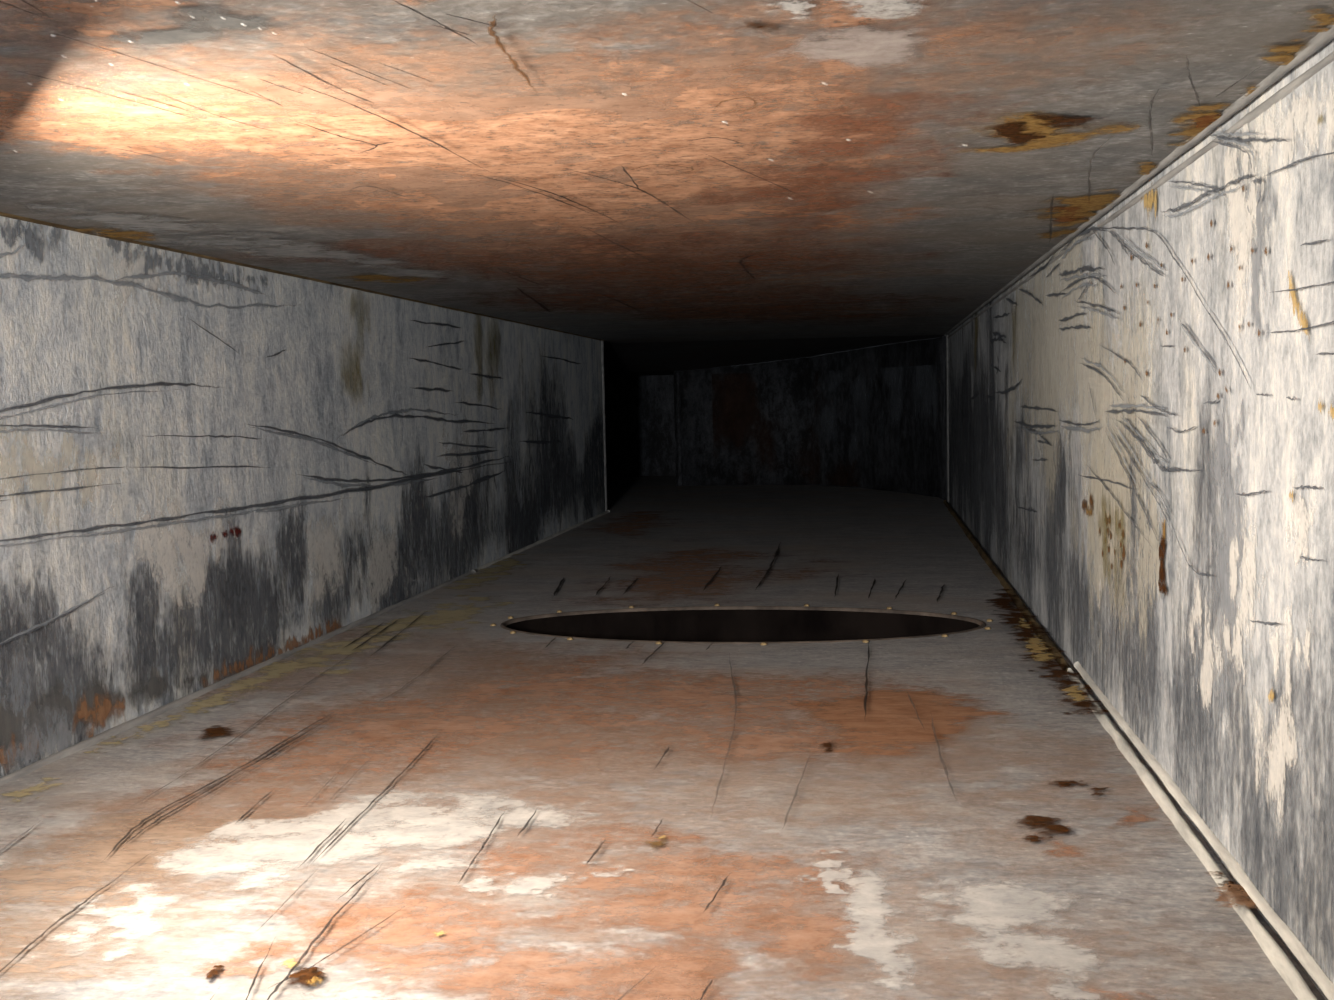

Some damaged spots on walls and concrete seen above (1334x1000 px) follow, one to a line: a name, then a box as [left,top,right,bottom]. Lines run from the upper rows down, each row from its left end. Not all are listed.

corrosion [1169,86,1259,146]
corrosion [0,0,1141,397]
damp [0,359,605,776]
corrosion [1082,493,1125,579]
corrosion [1158,519,1167,596]
damp [803,302,1334,1000]
damp [159,790,634,897]
corrosion [0,650,1006,1000]
corrosion [1018,815,1081,857]
corrosion [1051,780,1109,795]
damp [55,884,177,961]
corrosion [1210,871,1256,907]